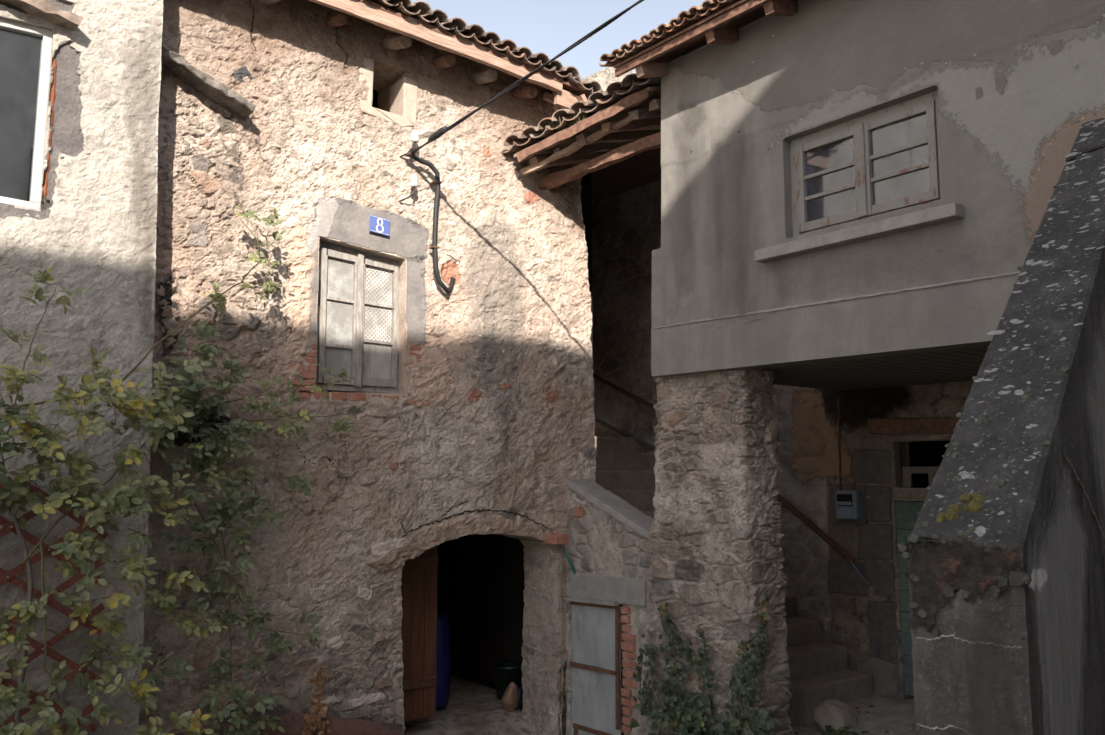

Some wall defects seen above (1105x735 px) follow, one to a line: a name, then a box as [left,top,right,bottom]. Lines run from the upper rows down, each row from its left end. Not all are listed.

flaking render [0,41,90,222]
peeling [668,0,1105,245]
crack [400,500,554,538]
spalling [897,537,1032,635]
crack [916,632,1020,648]
crack [918,723,974,735]